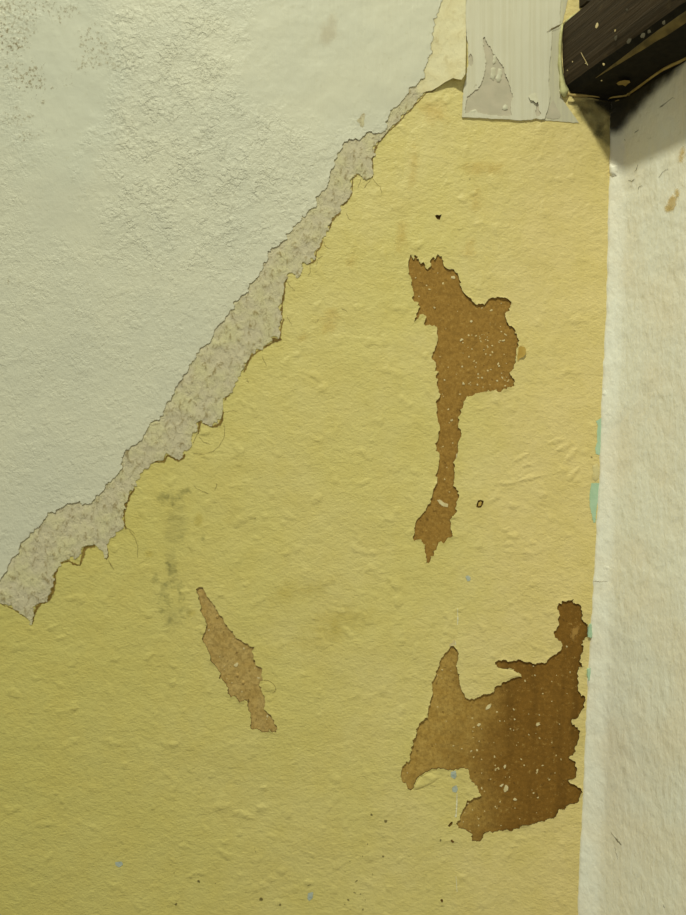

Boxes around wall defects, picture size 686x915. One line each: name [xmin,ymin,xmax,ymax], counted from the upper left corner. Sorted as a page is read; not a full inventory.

peeling [465,37,513,116]
peeling [408,255,526,563]
peeling [196,587,277,732]
peeling [401,600,592,841]